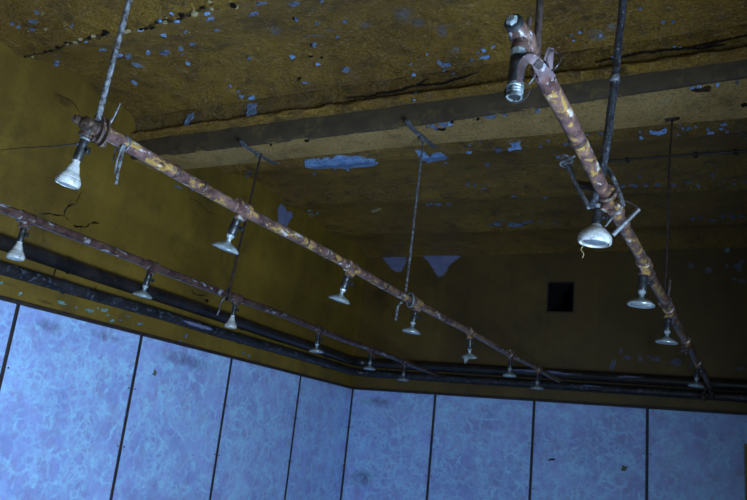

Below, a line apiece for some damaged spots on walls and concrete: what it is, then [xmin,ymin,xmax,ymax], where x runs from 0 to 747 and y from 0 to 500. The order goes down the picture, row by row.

peeling [9,10,47,31]
crack [596,35,747,63]
crack [346,72,478,99]
peeling [228,85,257,116]
peeling [304,155,378,175]
crack [40,193,100,243]
peeling [277,203,293,227]
peeling [384,257,407,272]
peeling [424,255,461,277]